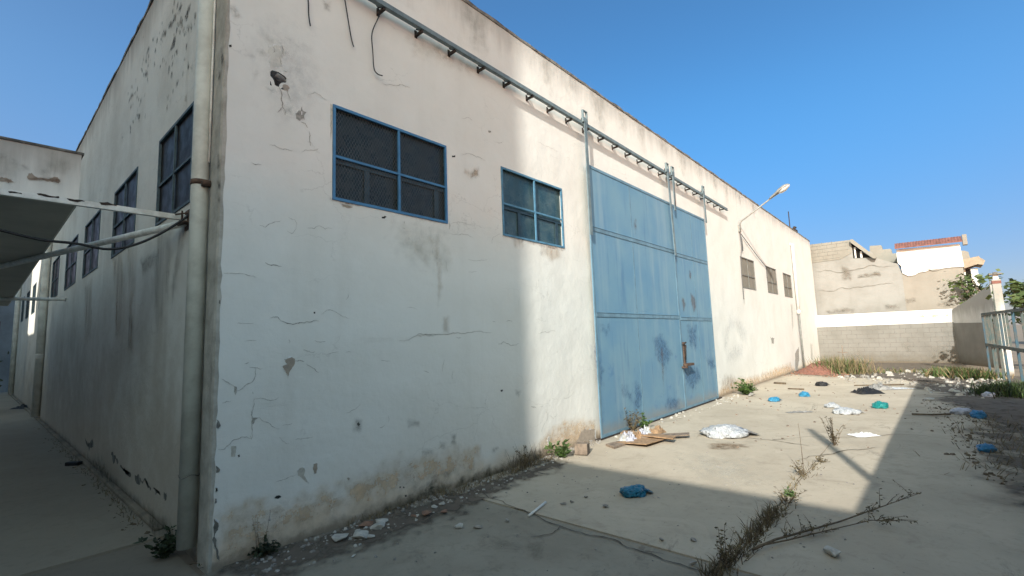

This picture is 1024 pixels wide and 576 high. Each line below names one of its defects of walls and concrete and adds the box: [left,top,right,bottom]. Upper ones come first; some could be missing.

crack [252,46,324,165]
spalling [27,173,83,202]
crack [401,307,512,346]
peeling [282,356,319,377]
crack [219,323,312,450]